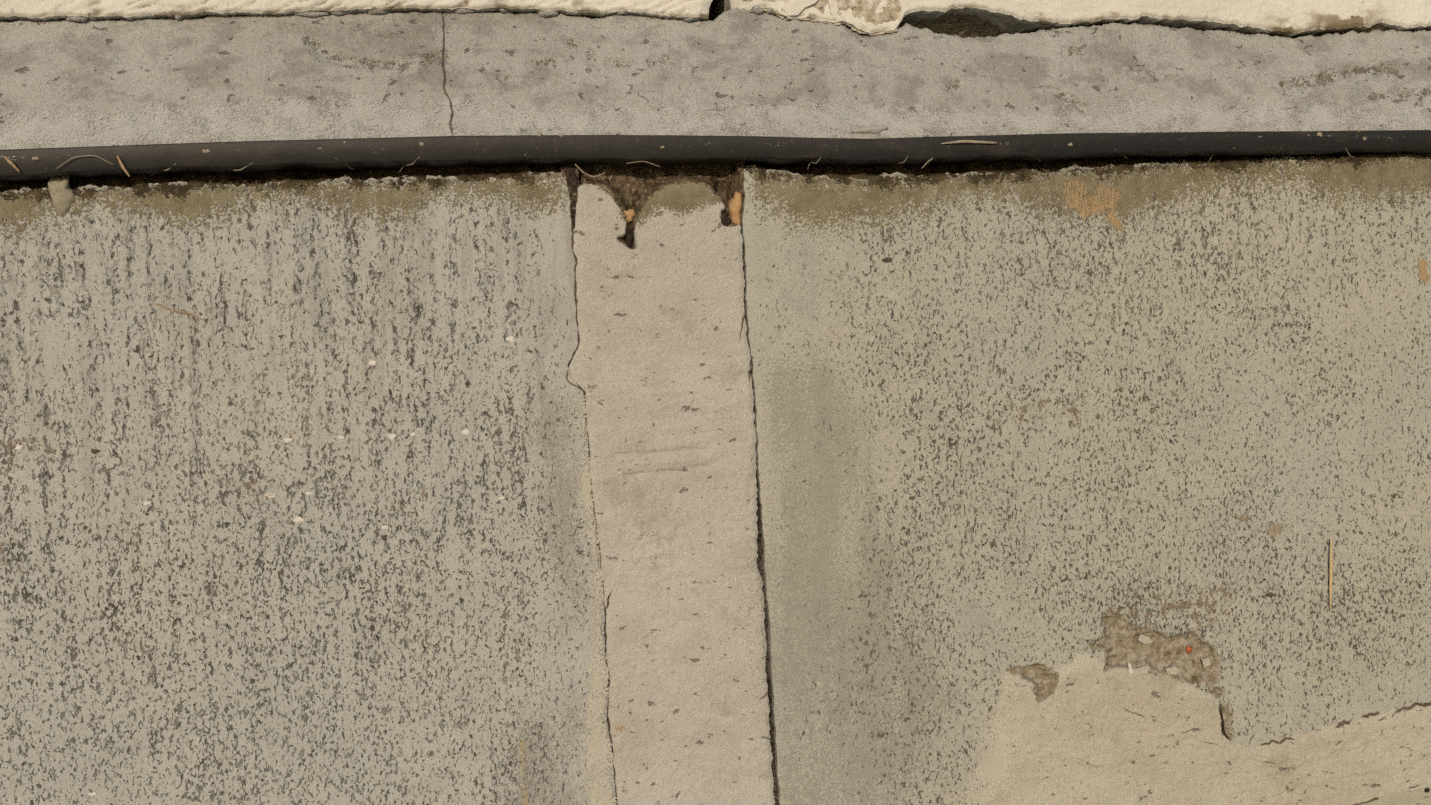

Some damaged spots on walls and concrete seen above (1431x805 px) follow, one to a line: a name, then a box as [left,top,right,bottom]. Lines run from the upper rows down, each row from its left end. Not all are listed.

spalling [742,0,1009,38]
spalling [1292,15,1393,39]
crack [560,163,618,805]
crack [739,231,779,805]
spalling [1006,662,1059,706]
spalling [1089,612,1235,742]